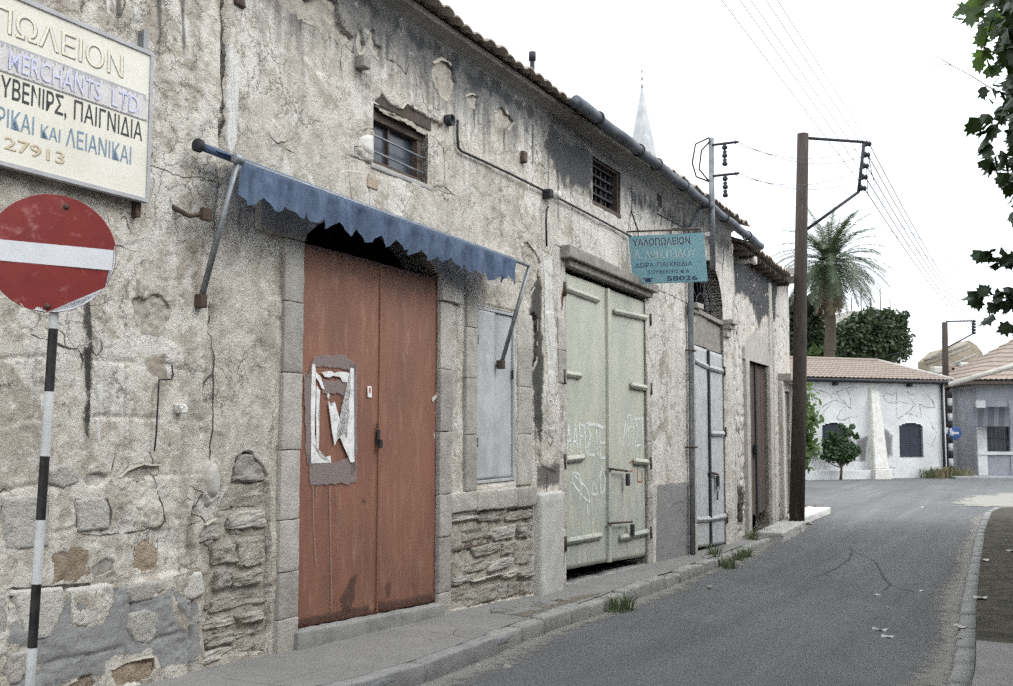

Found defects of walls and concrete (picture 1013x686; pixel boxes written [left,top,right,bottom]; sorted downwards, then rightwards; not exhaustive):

crack [218,0,226,137]
water stain [363,0,534,145]
spalling [375,102,440,135]
crack [31,298,114,371]
flaking render [48,464,110,532]
peeling [118,459,163,482]
flaking render [0,495,117,639]
flaking render [126,536,236,656]
crack [812,546,917,593]
flaking render [4,648,27,684]
spalling [62,675,94,686]
spalling [110,656,161,686]